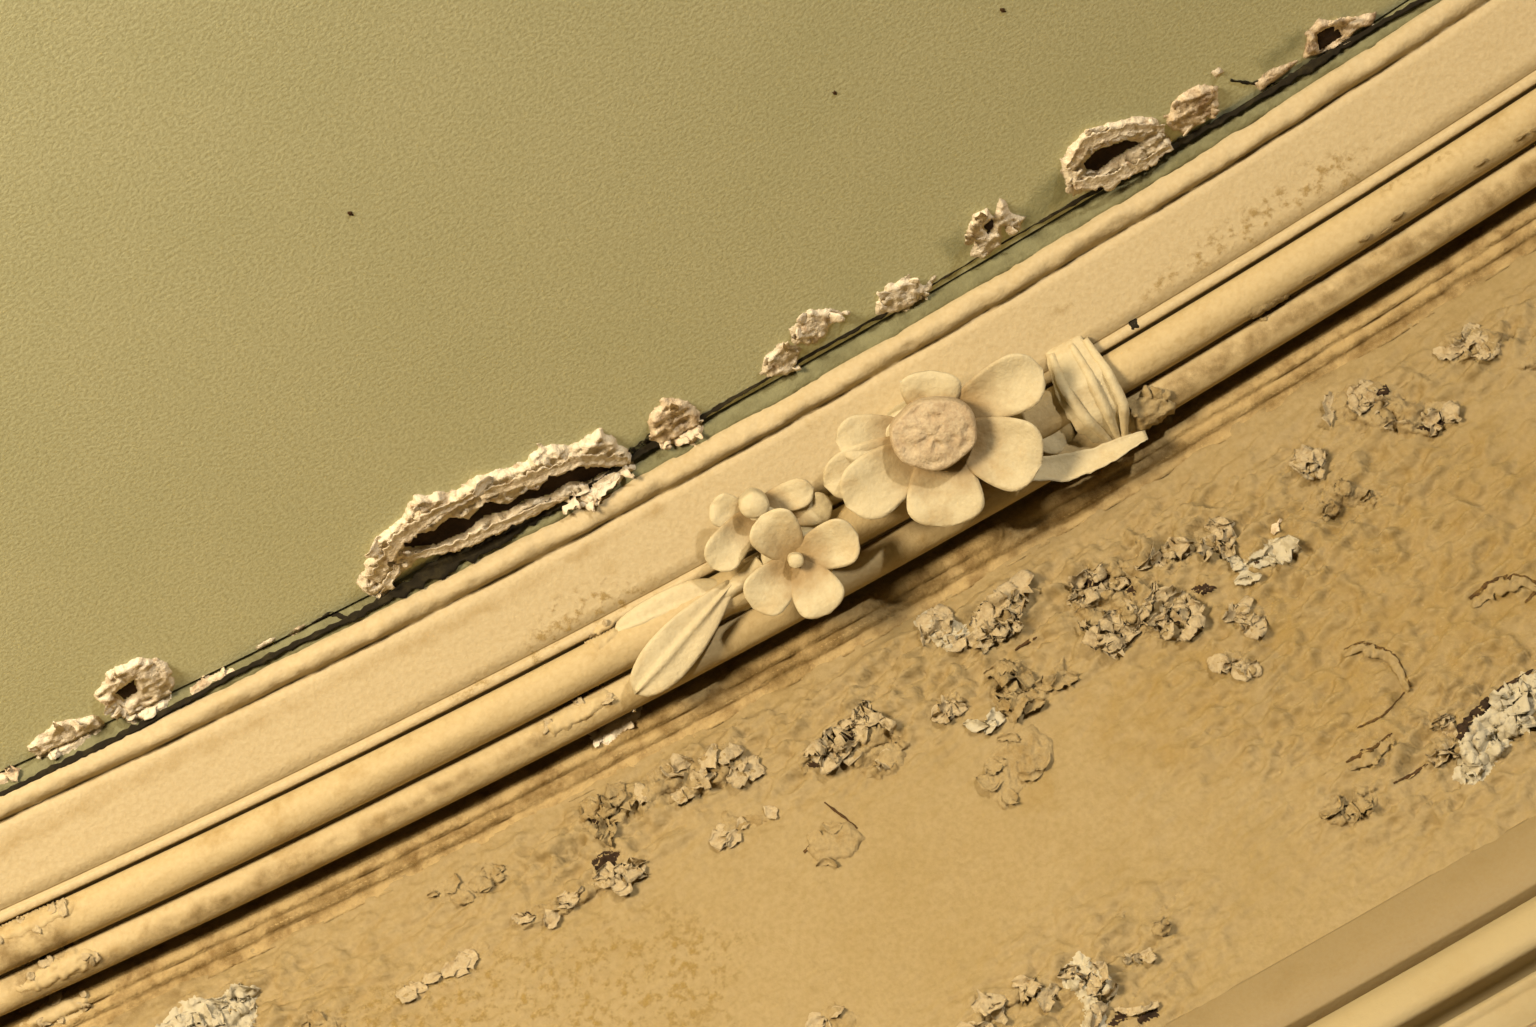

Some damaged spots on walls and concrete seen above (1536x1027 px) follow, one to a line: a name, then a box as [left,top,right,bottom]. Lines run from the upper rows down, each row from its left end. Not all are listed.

peeling [1254,12,1376,93]
peeling [1059,67,1224,197]
peeling [964,198,1026,259]
peeling [759,308,851,379]
peeling [647,398,704,450]
peeling [356,428,637,605]
peeling [913,570,1079,735]
peeling [1065,516,1302,682]
peeling [0,657,235,784]
flaking render [1423,669,1536,785]
peeling [511,742,766,931]
peeling [957,890,1185,1027]